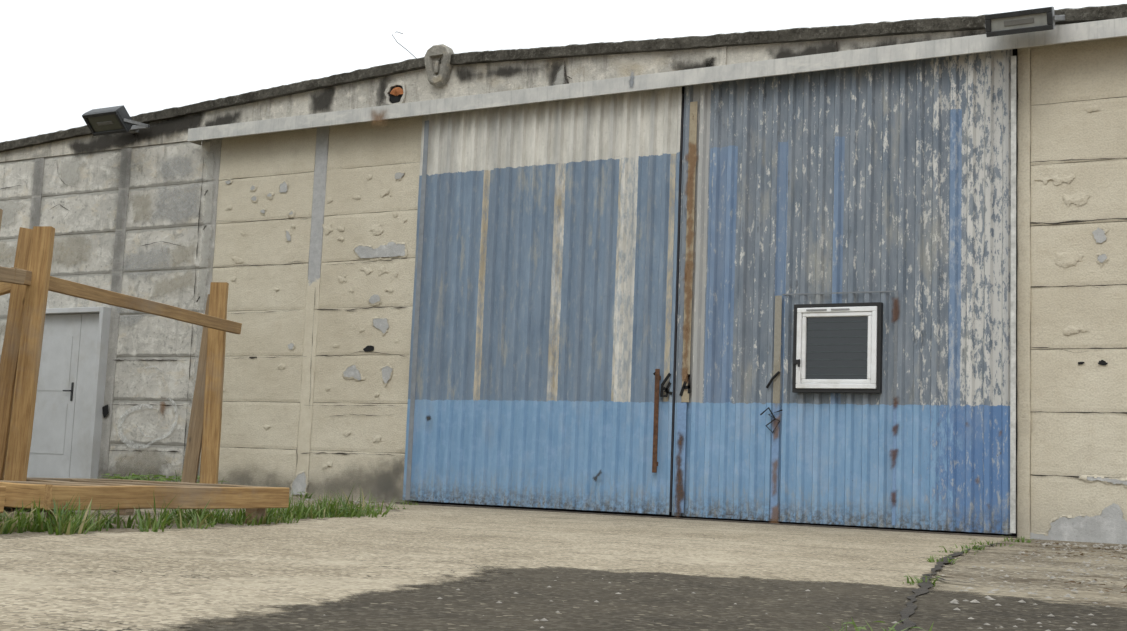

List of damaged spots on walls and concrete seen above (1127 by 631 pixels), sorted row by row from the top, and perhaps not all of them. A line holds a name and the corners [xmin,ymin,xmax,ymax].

corrosion [683,143,697,381]
peeling [1030,503,1127,544]